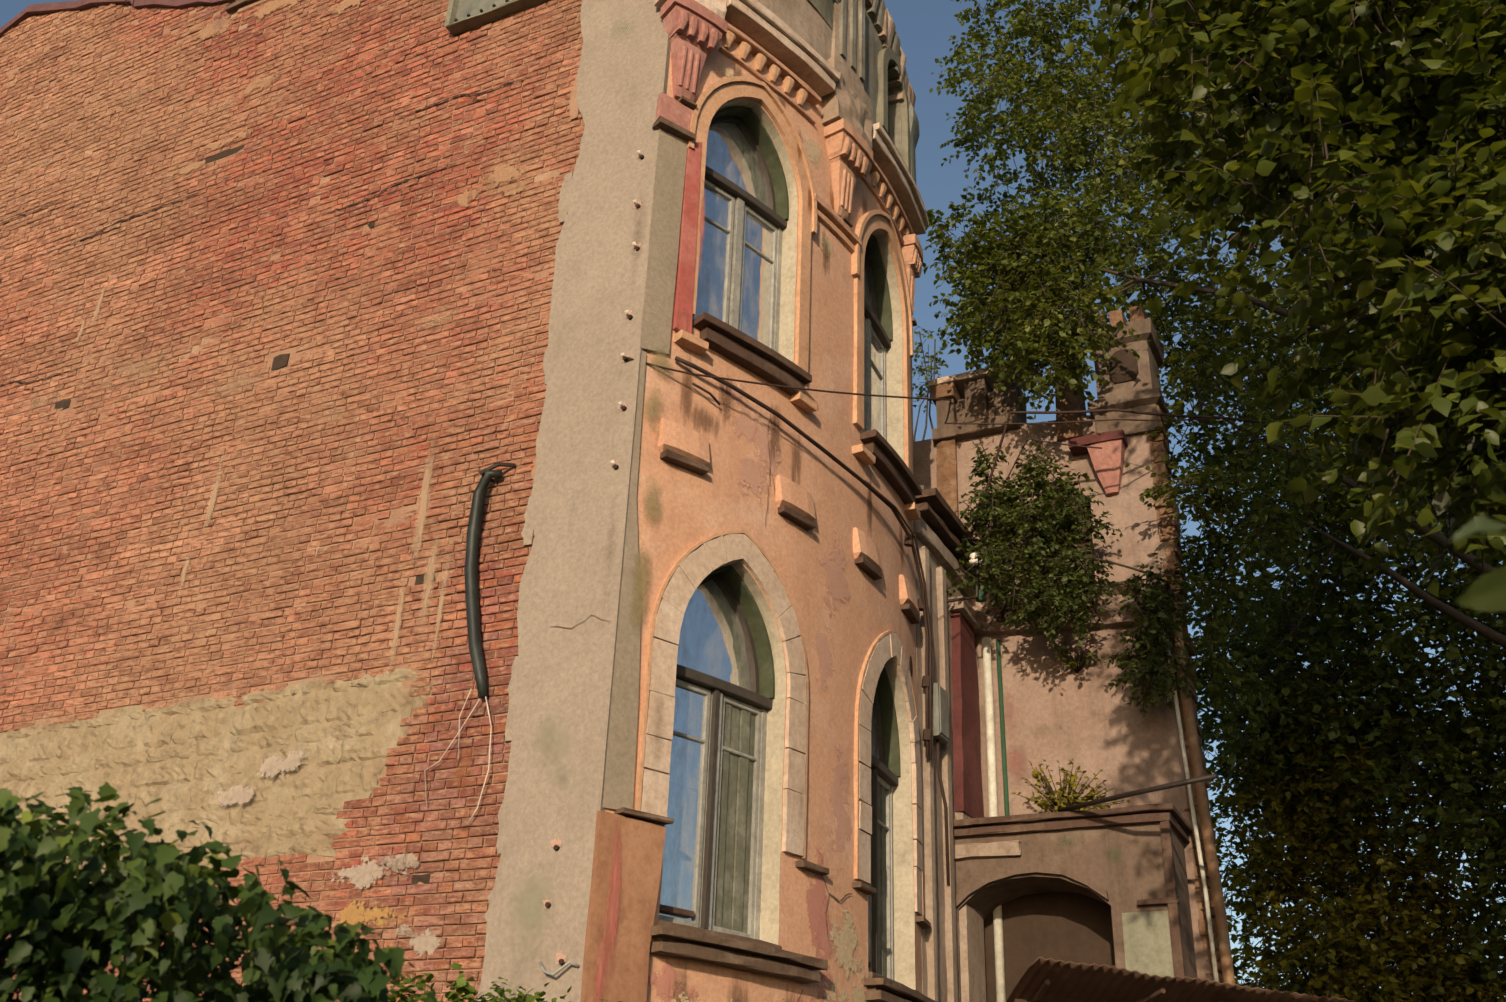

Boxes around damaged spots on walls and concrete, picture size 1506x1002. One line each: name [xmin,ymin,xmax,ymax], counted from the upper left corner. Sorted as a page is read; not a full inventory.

leakage [653,353,731,429]
leakage [771,416,800,481]
spalling [412,873,434,885]
peeling [339,900,407,933]
flaking render [782,849,866,1002]